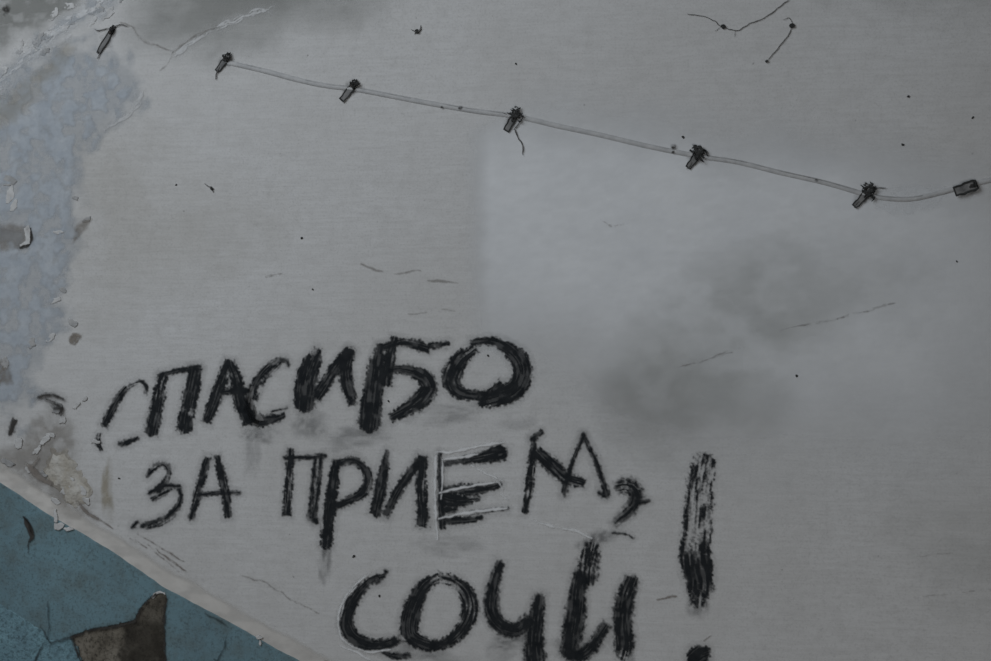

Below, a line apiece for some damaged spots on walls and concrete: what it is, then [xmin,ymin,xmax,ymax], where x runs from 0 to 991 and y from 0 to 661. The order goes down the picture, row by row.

flaking render [70,591,167,661]